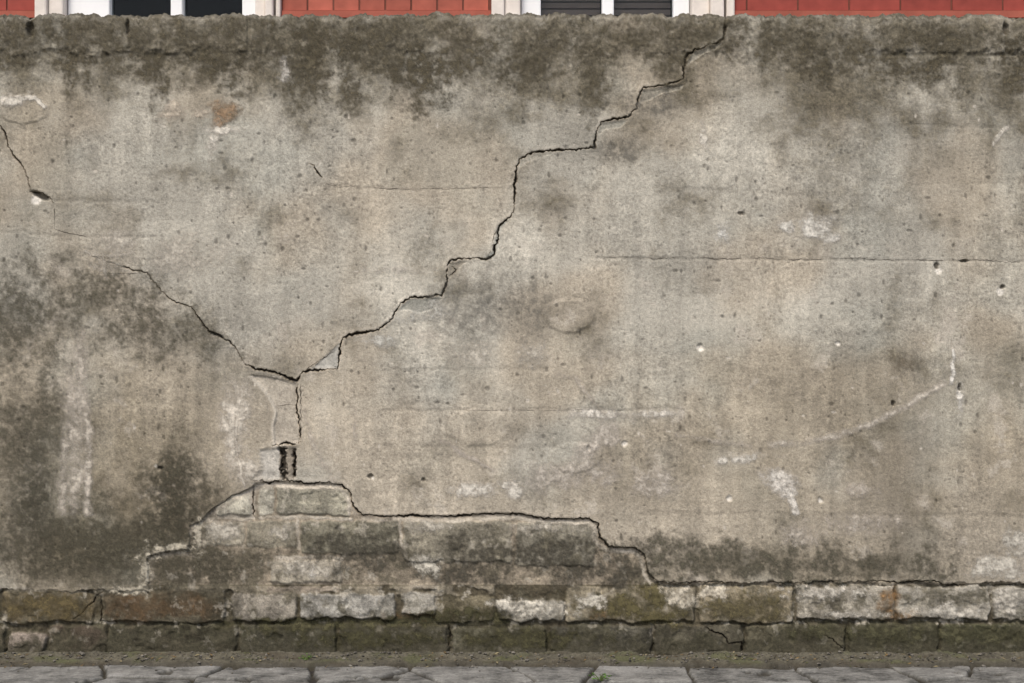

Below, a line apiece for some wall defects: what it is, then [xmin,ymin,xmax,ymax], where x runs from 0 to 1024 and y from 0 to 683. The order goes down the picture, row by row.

damp [0,16,749,120]
damp [754,19,1024,94]
crack [0,17,739,589]
damp [0,231,253,596]
damp [220,385,259,486]
spalling [147,373,657,589]
damp [284,518,903,619]
crack [764,577,840,588]
damp [910,545,956,583]
crack [866,577,1024,591]
damp [915,601,980,620]
damp [971,531,1024,615]